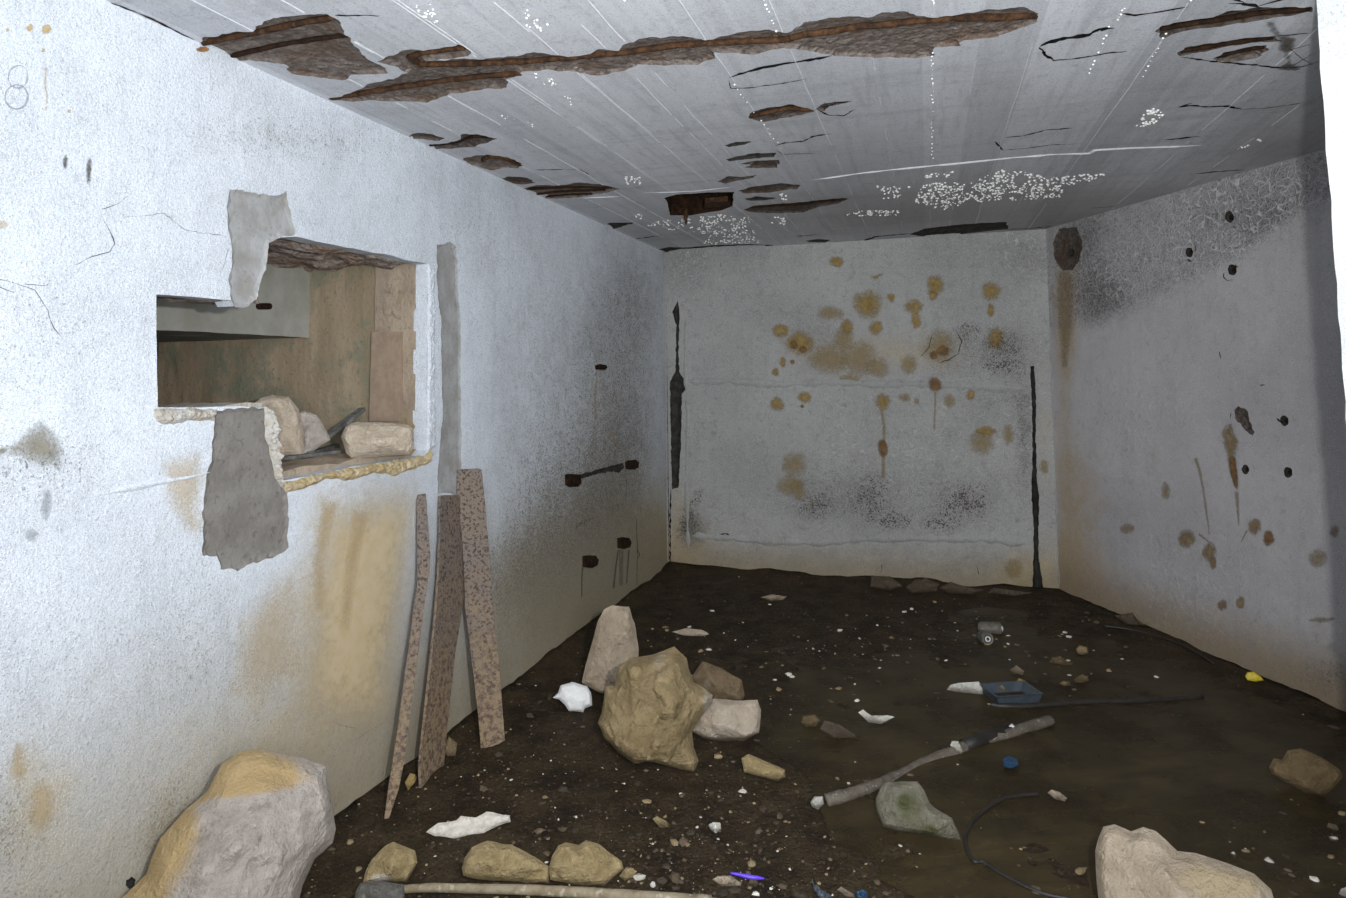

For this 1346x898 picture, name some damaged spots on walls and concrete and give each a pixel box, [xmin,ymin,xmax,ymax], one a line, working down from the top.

spalling [200,7,1038,103]
crack [1039,7,1185,61]
spalling [1155,7,1313,62]
spalling [409,133,619,199]
spalling [718,141,849,213]
corrosion [772,274,943,381]
spalling [264,264,436,492]
corrosion [876,394,918,477]
corrosion [929,378,974,429]
leakage [798,472,994,534]
corrosion [1222,425,1274,545]
corrosion [1179,532,1216,568]